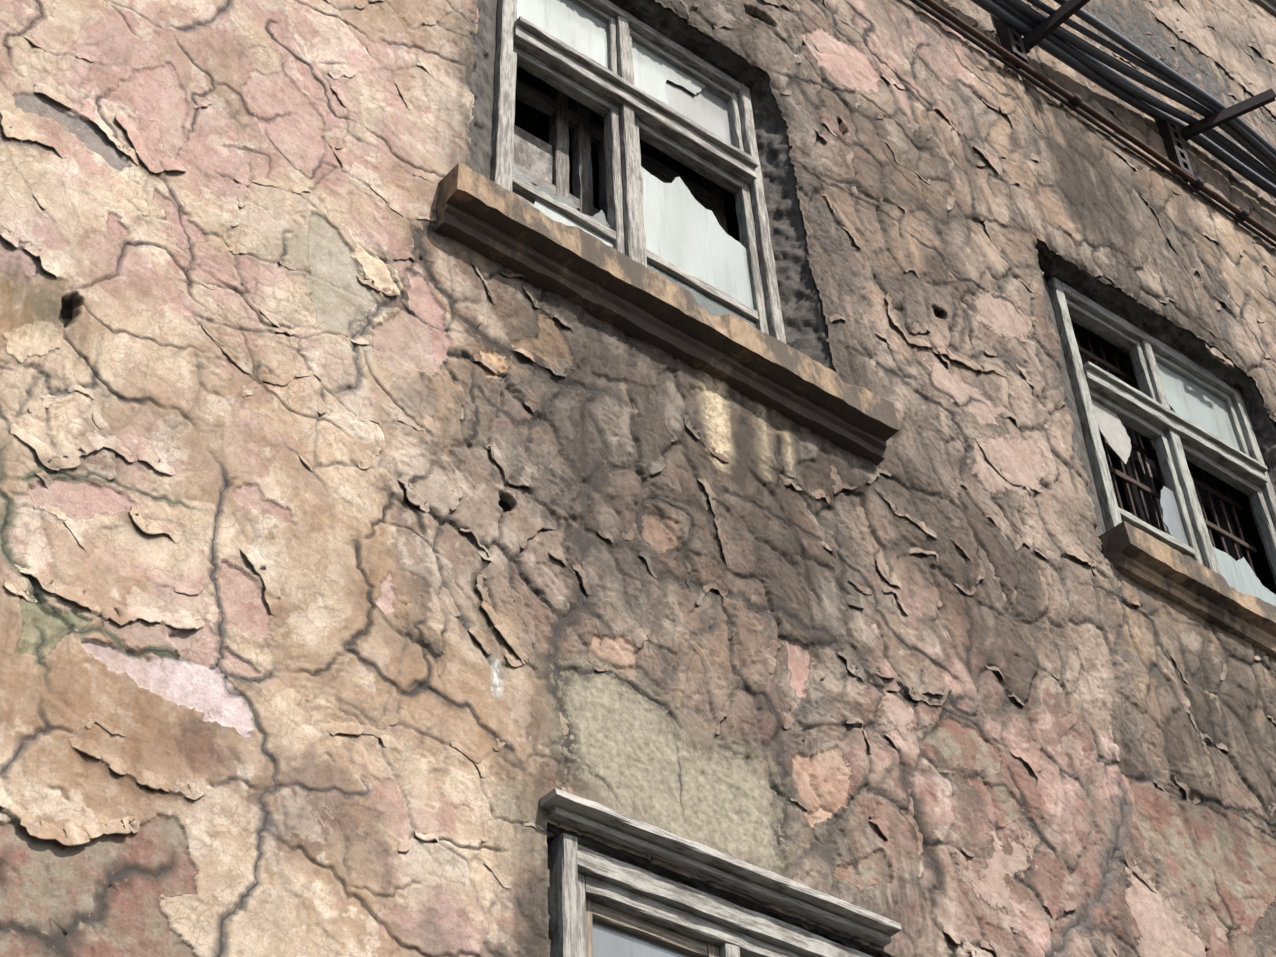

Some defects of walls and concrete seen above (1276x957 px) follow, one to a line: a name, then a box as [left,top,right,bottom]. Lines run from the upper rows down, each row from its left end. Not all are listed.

peeling [0,62,277,255]
crack [106,0,322,179]
crack [832,3,1016,166]
crack [76,182,194,350]
peeling [279,211,451,378]
crack [312,223,675,789]
peeling [3,545,281,738]
crack [0,447,476,957]
crack [637,493,993,744]
peeling [0,794,199,957]
peeling [789,737,893,891]
peeling [1110,743,1276,957]